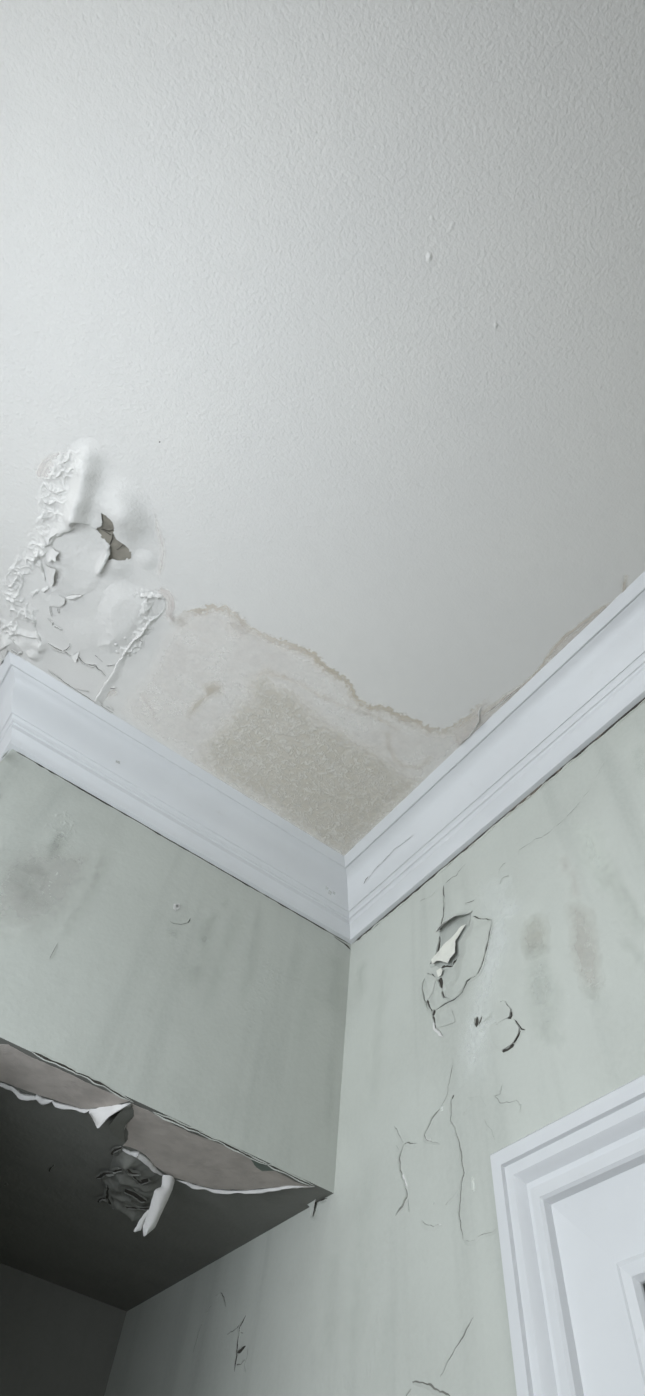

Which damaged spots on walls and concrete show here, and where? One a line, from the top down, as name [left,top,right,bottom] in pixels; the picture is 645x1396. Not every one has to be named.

peeling [47,670,114,714]
leakage [182,638,411,852]
peeling [419,885,492,1037]
peeling [474,1000,525,1054]
peeling [0,1044,328,1237]
crack [394,1065,523,1246]
crack [404,1315,474,1396]